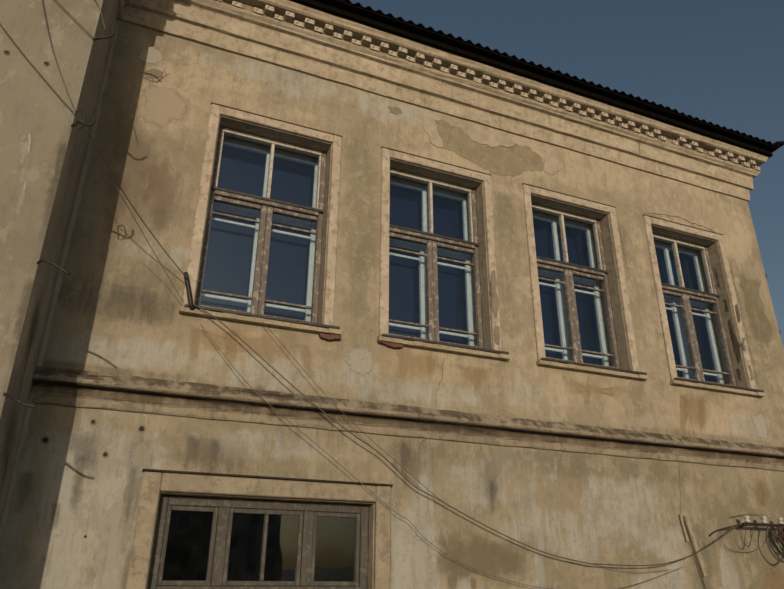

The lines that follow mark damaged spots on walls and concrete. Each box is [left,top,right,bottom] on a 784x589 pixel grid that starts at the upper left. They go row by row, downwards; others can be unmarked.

flaking render [138,46,163,79]
flaking render [423,117,562,177]
flaking render [377,335,404,349]
water stain [412,473,516,589]